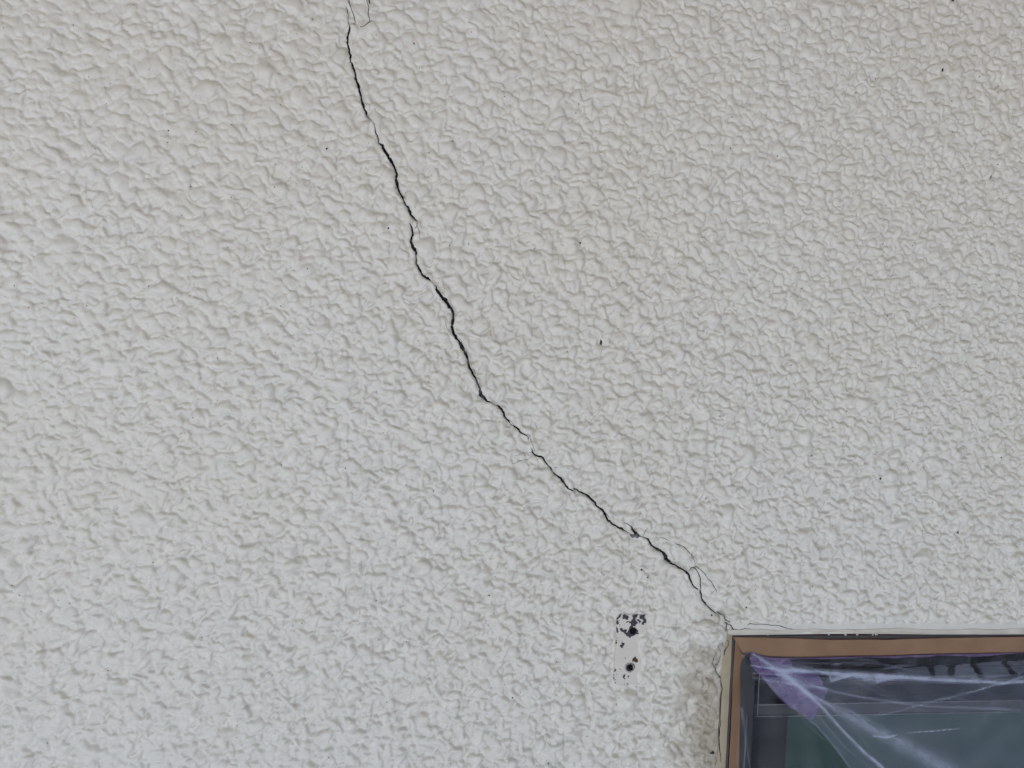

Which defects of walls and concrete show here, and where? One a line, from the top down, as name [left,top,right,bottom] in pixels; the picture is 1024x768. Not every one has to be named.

crack [345,0,791,761]